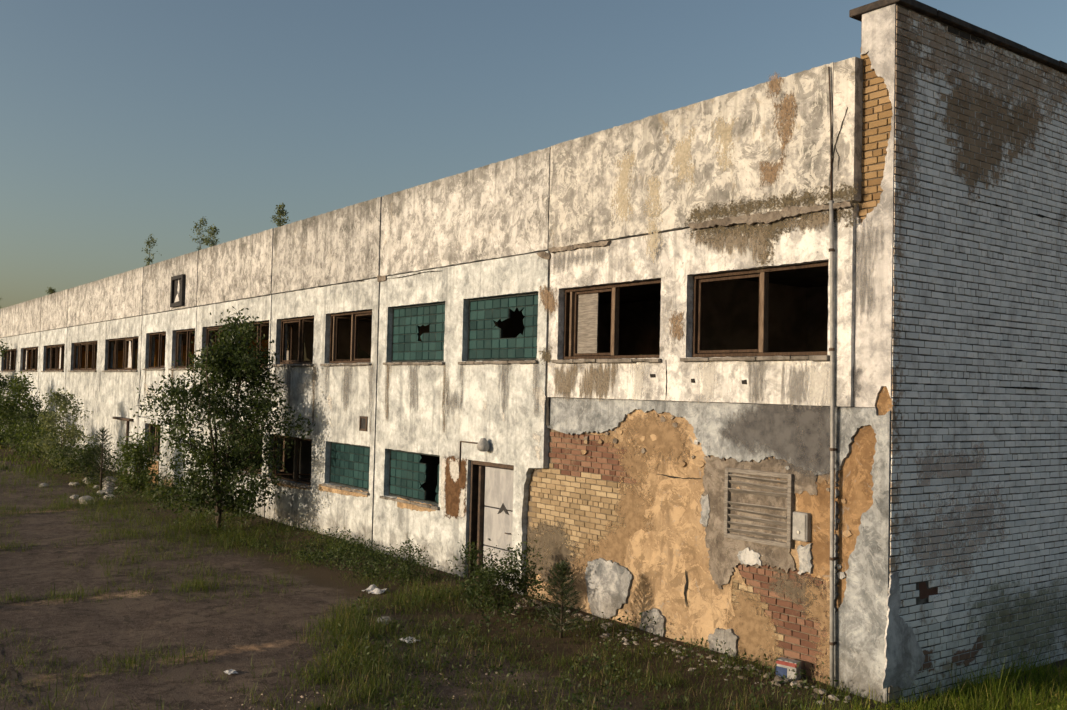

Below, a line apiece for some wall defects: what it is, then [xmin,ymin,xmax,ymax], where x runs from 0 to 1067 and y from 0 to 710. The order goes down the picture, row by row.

water stain [612,152,663,262]
water stain [714,117,738,171]
spalling [685,47,893,272]
peeling [899,11,1067,201]
peeling [533,387,546,413]
spalling [876,386,895,415]
spalling [526,409,877,685]
spalling [919,581,938,599]